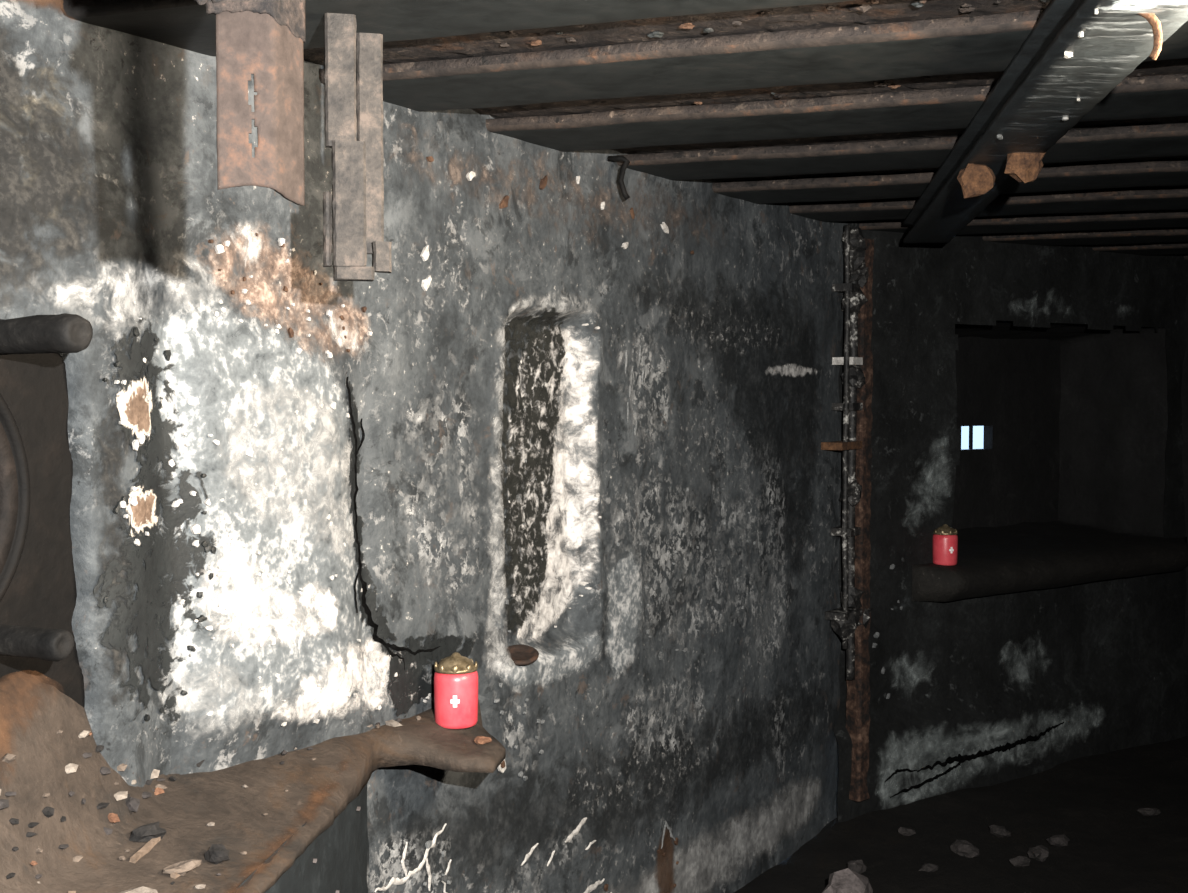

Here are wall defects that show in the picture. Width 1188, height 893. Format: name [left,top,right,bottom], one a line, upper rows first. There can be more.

leakage [242,227,260,258]
peeling [102,232,389,729]
crack [346,377,440,670]
crack [885,721,1064,798]
leakage [636,780,820,893]